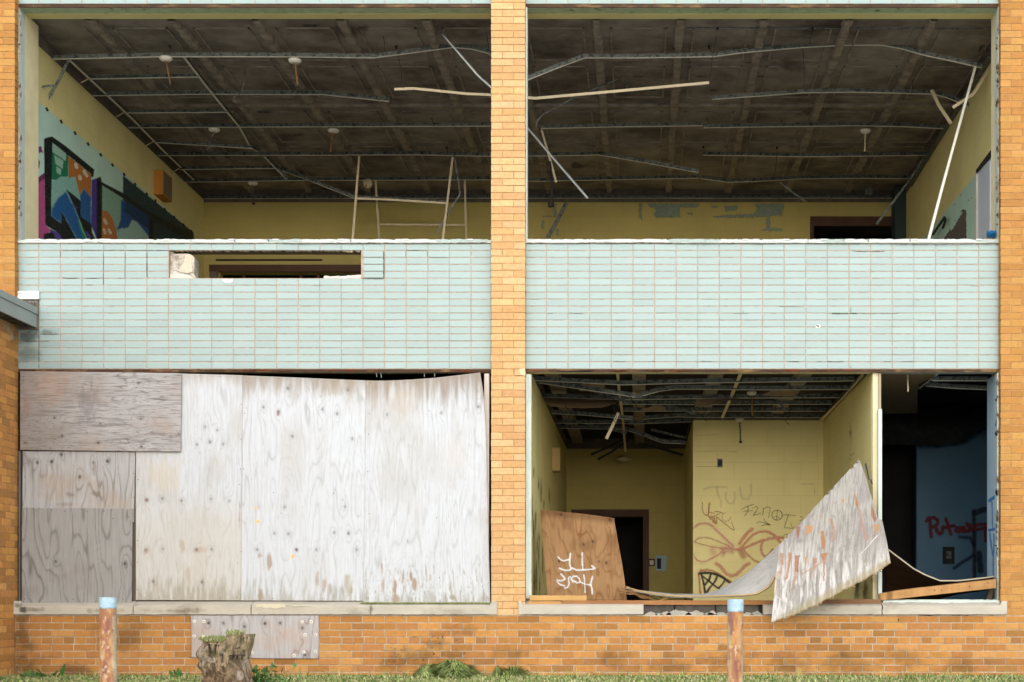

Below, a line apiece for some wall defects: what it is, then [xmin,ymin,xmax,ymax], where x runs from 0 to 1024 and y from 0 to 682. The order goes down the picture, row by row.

peeling [526,176,999,243]
peeling [25,239,488,273]